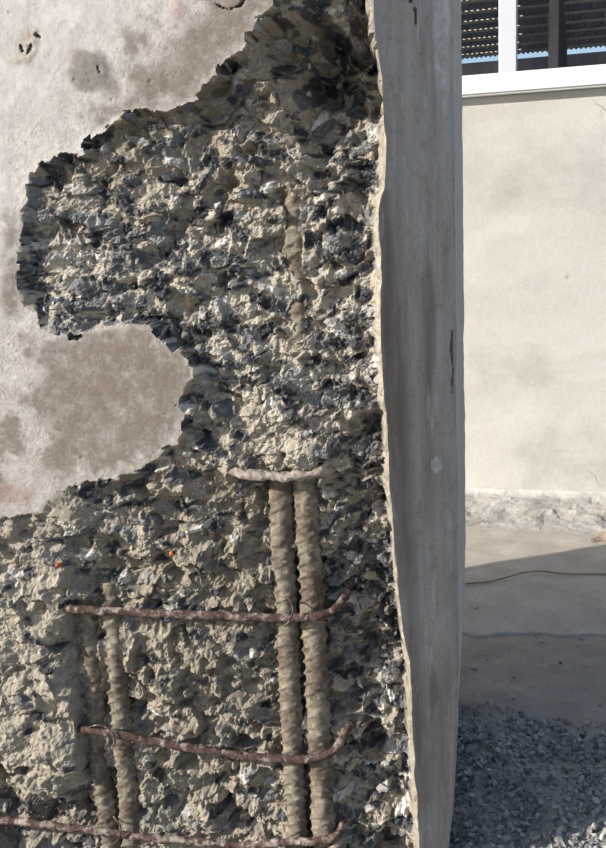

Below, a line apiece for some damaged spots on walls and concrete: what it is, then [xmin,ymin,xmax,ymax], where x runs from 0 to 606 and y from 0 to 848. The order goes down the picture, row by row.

leakage [0,0,116,123]
crack [216,0,246,10]
leakage [24,331,188,470]
spalling [0,0,419,848]